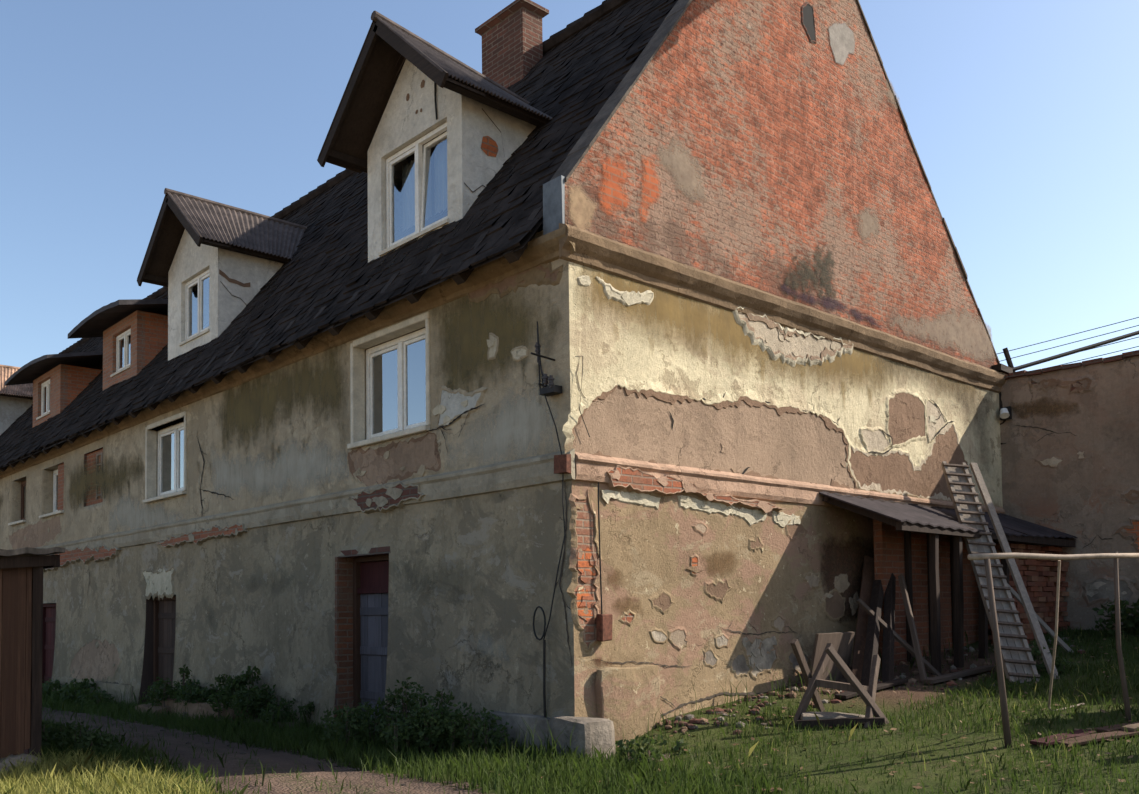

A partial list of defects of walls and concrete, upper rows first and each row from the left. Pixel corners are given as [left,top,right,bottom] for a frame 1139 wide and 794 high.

flaking render [577,275,654,307]
leakage [781,247,881,328]
leakage [592,269,984,421]
spalling [732,306,853,367]
spalling [346,385,488,514]
spalling [9,514,122,573]
flaking render [156,523,248,548]
spalling [562,377,973,653]
flaking render [140,564,176,601]
crack [556,481,691,668]
crack [717,621,796,665]
crack [660,692,760,718]